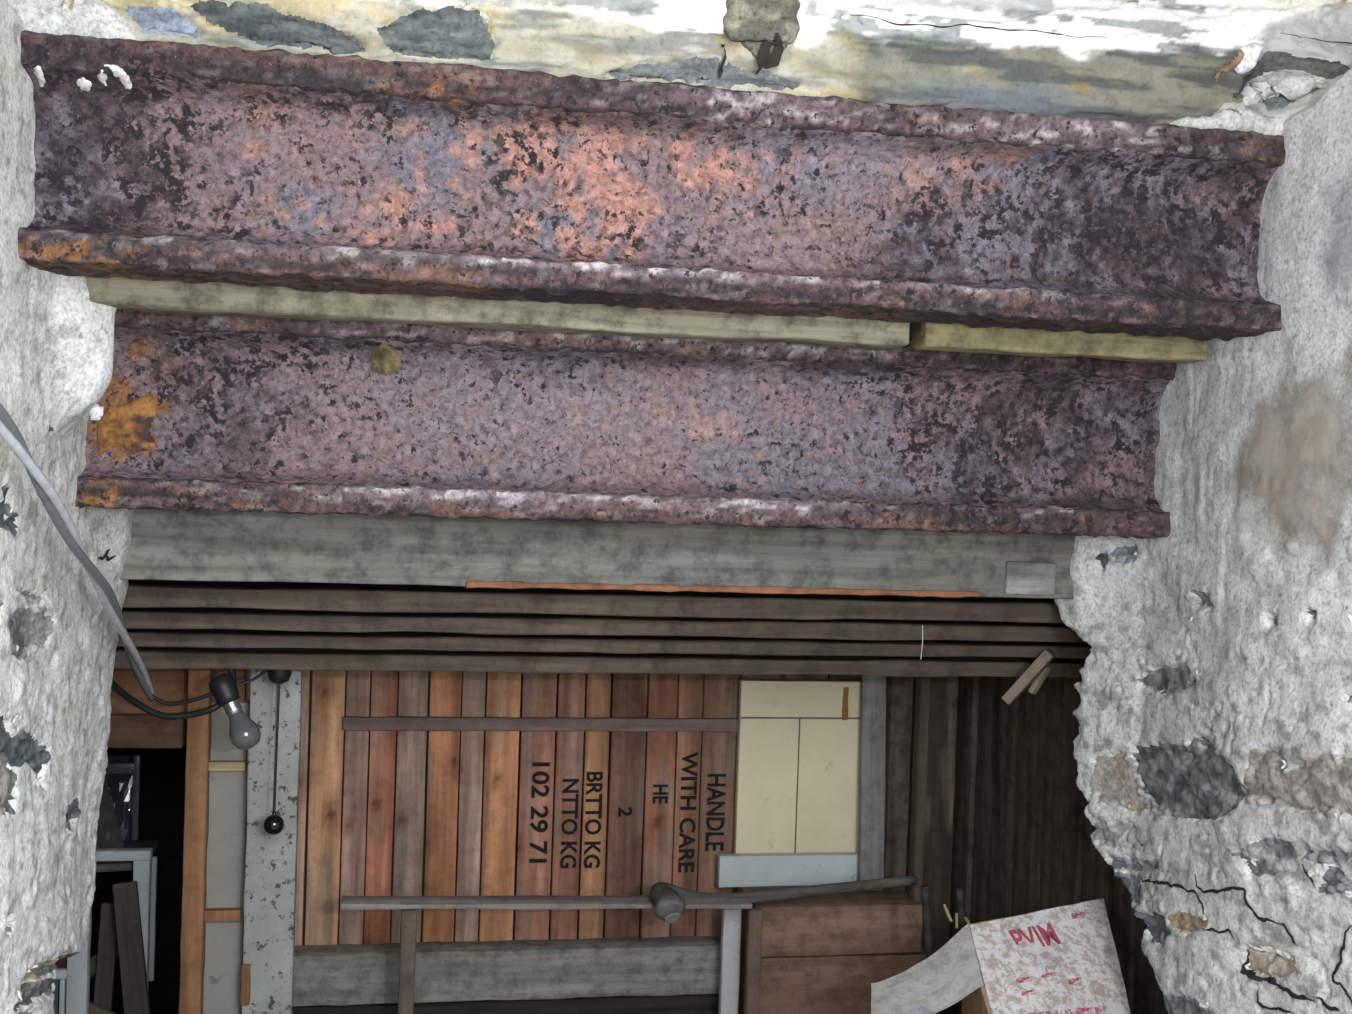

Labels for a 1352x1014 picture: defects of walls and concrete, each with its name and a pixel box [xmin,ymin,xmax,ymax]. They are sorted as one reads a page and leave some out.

flaking render [127,0,366,55]
flaking render [376,0,512,61]
peeling [886,0,1053,16]
flaking render [608,56,800,91]
flaking render [1261,94,1291,111]
flaking render [1214,42,1350,100]
rust [371,343,402,376]
rust [96,394,158,456]
flaking render [0,486,19,537]
flaking render [0,587,54,660]
flaking render [0,713,51,815]
crack [1138,874,1352,1014]